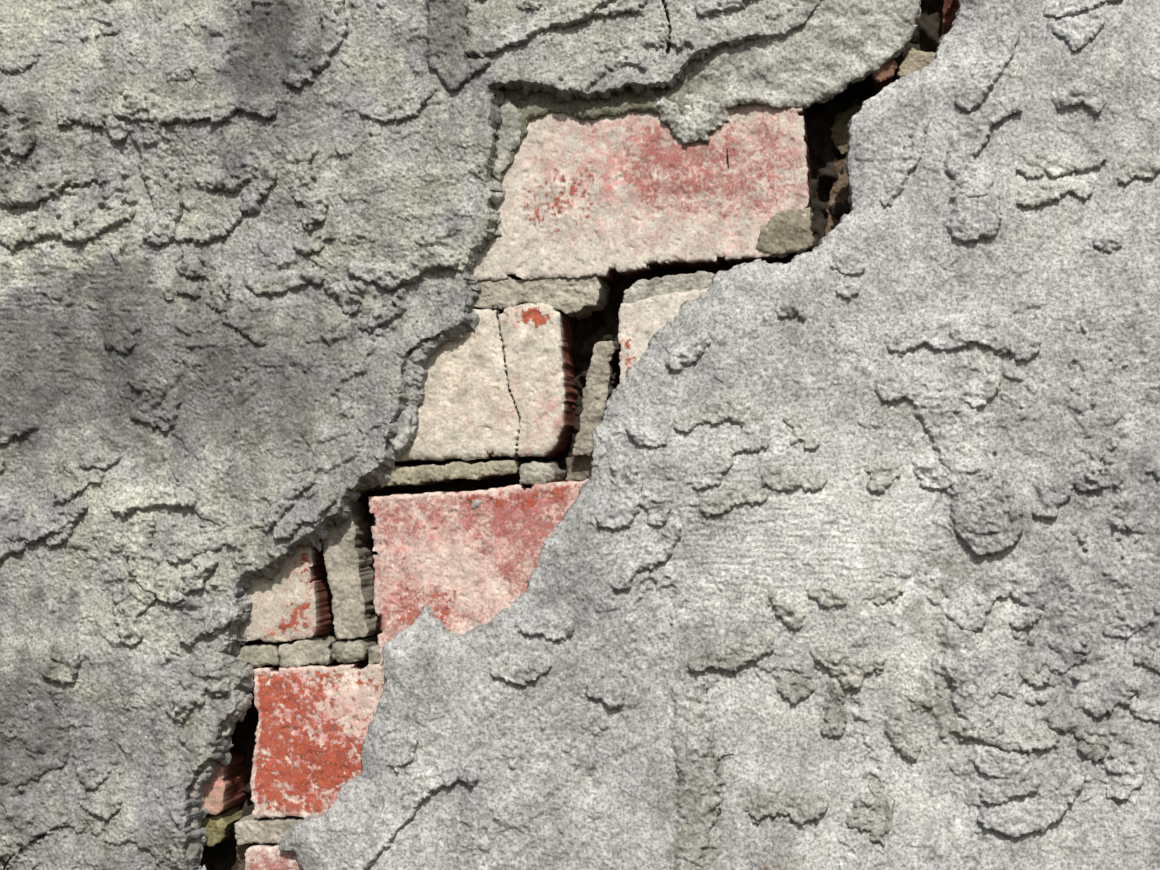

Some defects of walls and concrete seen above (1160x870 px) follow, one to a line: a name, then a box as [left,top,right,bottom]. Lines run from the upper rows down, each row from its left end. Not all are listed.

crack [662,0,671,52]
flaking render [490,0,921,217]
crack [805,0,944,247]
peeling [505,307,553,328]
peeling [524,159,601,236]
crack [774,257,791,265]
flaking render [381,334,450,472]
crack [357,262,733,555]
peeling [264,553,311,638]
peeling [376,483,582,636]
crack [200,639,267,870]
peeling [219,668,386,814]